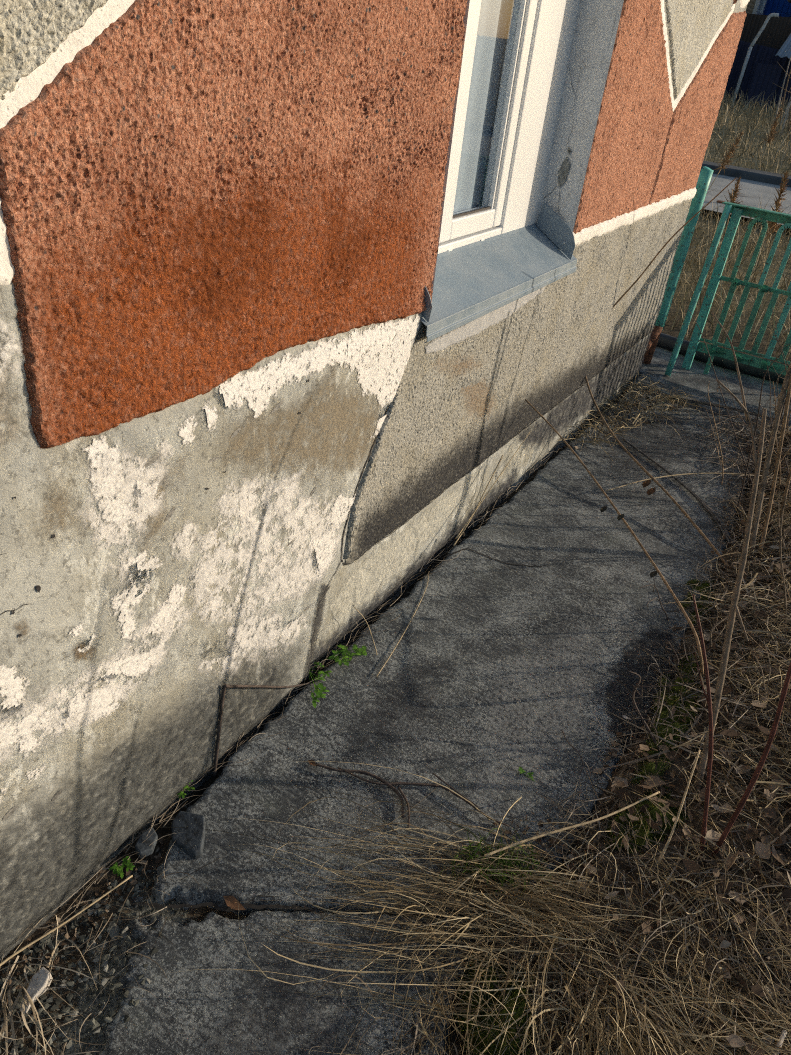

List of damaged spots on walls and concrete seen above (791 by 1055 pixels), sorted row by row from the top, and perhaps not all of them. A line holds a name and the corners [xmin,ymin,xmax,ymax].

spalling [0,320,21,444]
peeling [83,316,420,532]
peeling [227,493,356,664]
damp [0,327,652,957]
damp [607,628,680,751]
crack [133,895,318,912]